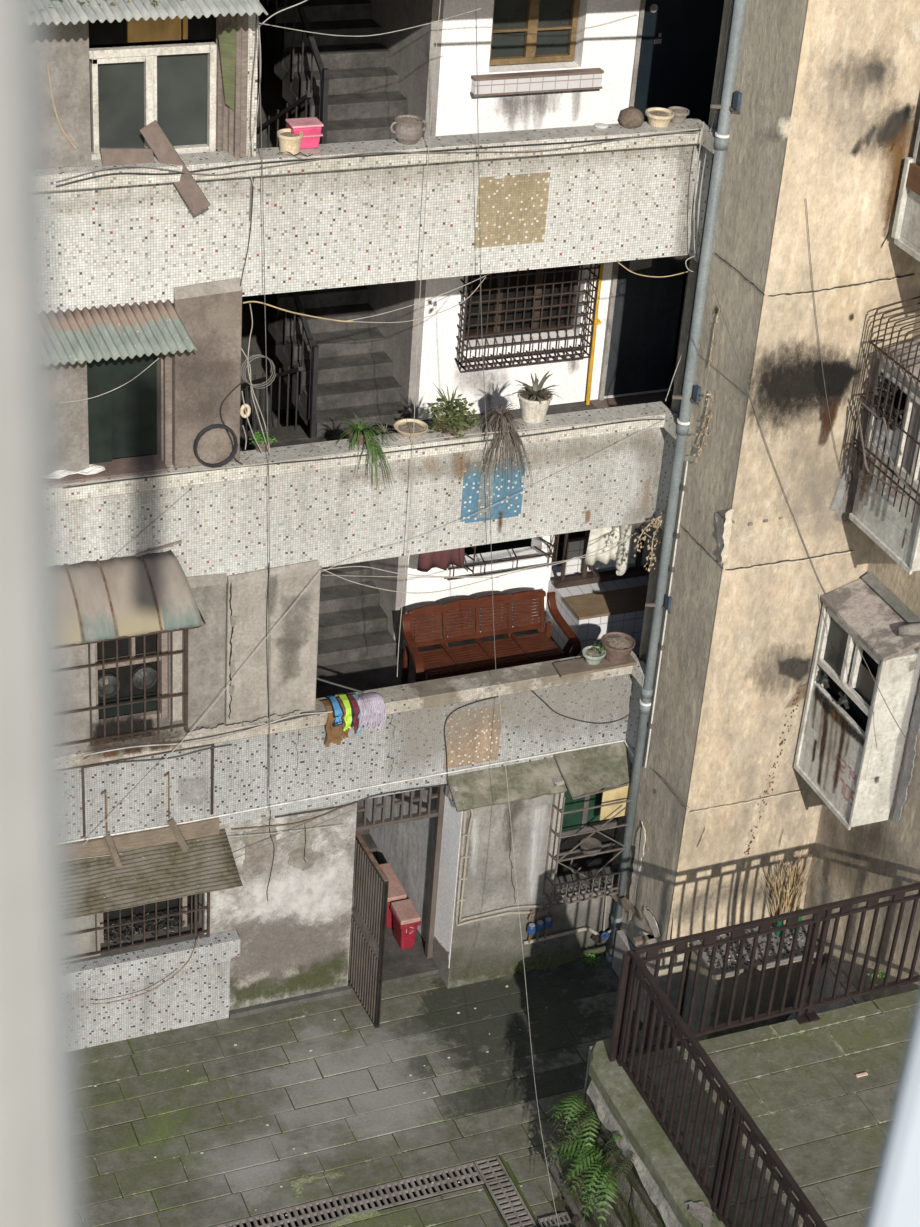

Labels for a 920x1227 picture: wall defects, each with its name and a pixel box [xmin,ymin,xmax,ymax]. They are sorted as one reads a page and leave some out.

damp [852,126,876,156]
crack [228,583,237,718]
corrosion [812,686,864,791]
damp [230,863,350,1008]